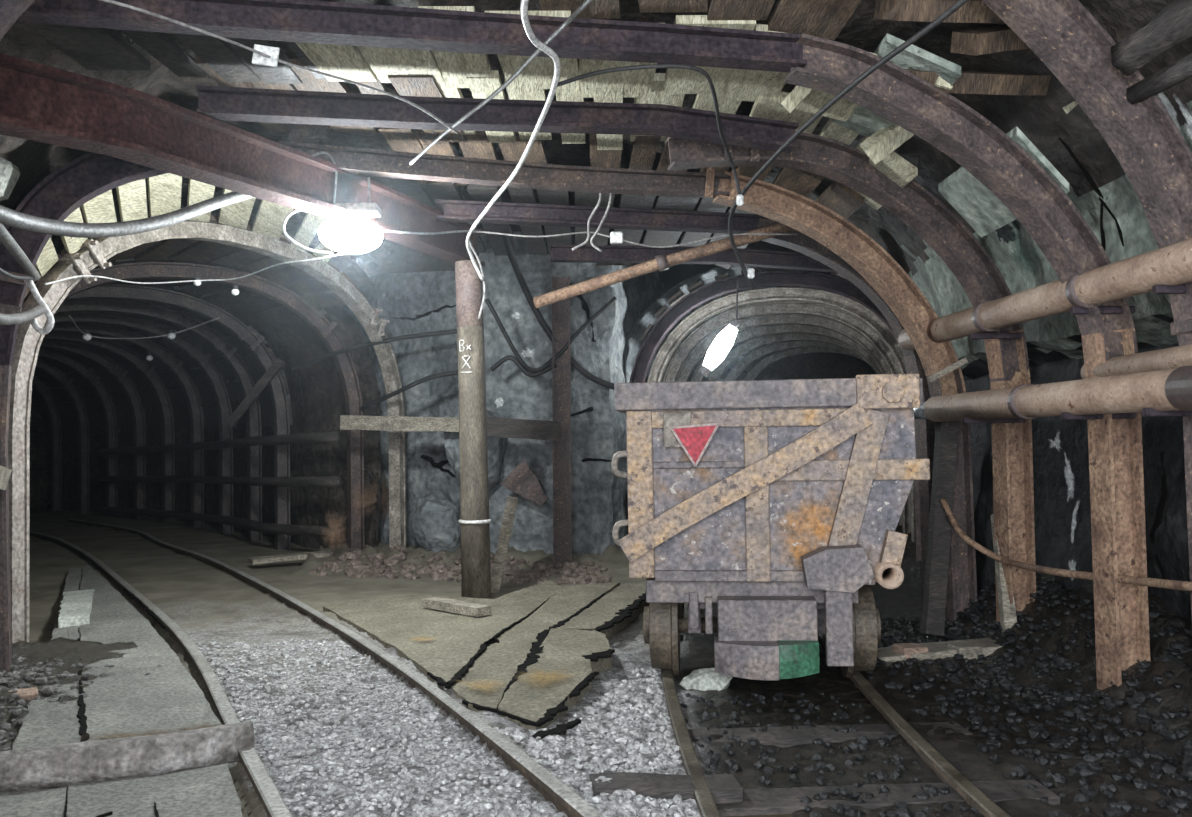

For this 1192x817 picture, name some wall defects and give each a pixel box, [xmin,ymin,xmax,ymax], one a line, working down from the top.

crack [77,638,90,742]
crack [427,591,646,740]
crack [96,809,113,817]